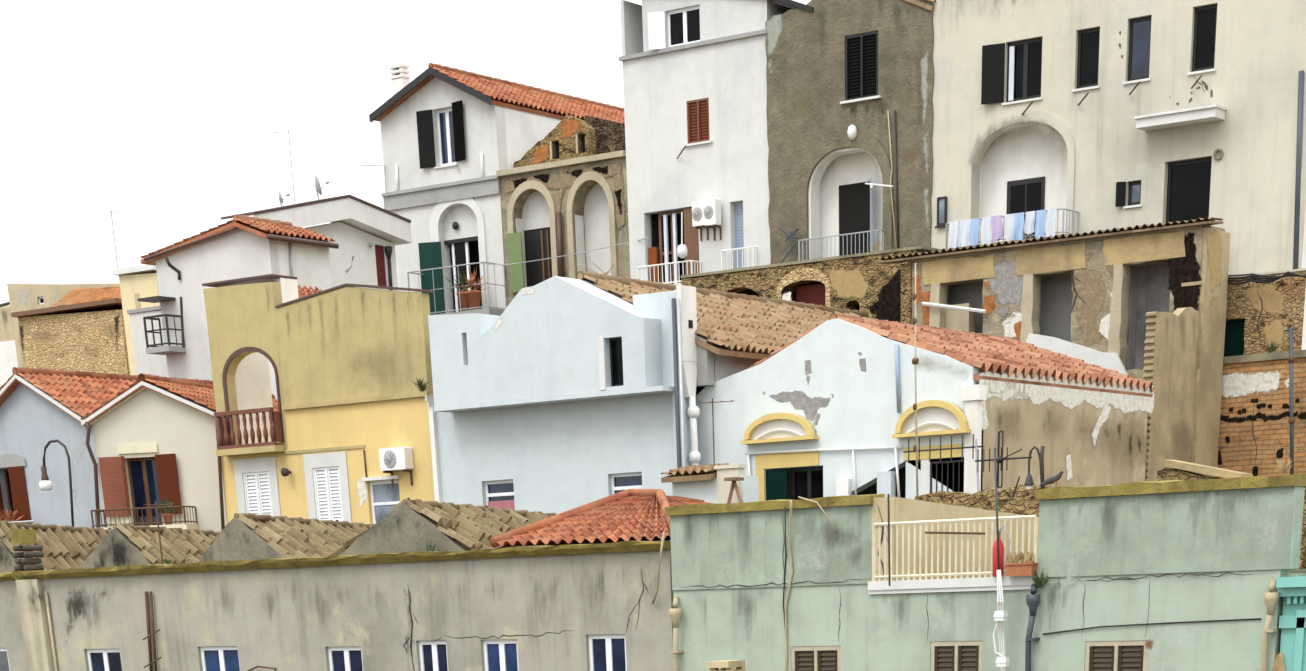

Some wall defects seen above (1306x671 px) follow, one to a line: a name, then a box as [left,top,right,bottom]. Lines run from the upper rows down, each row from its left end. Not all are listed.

flaking render [983,260,1023,339]
flaking render [763,360,834,425]
flaking render [979,371,1155,446]
flaking render [1218,371,1306,465]
water stain [68,593,84,625]
crack [403,587,573,671]